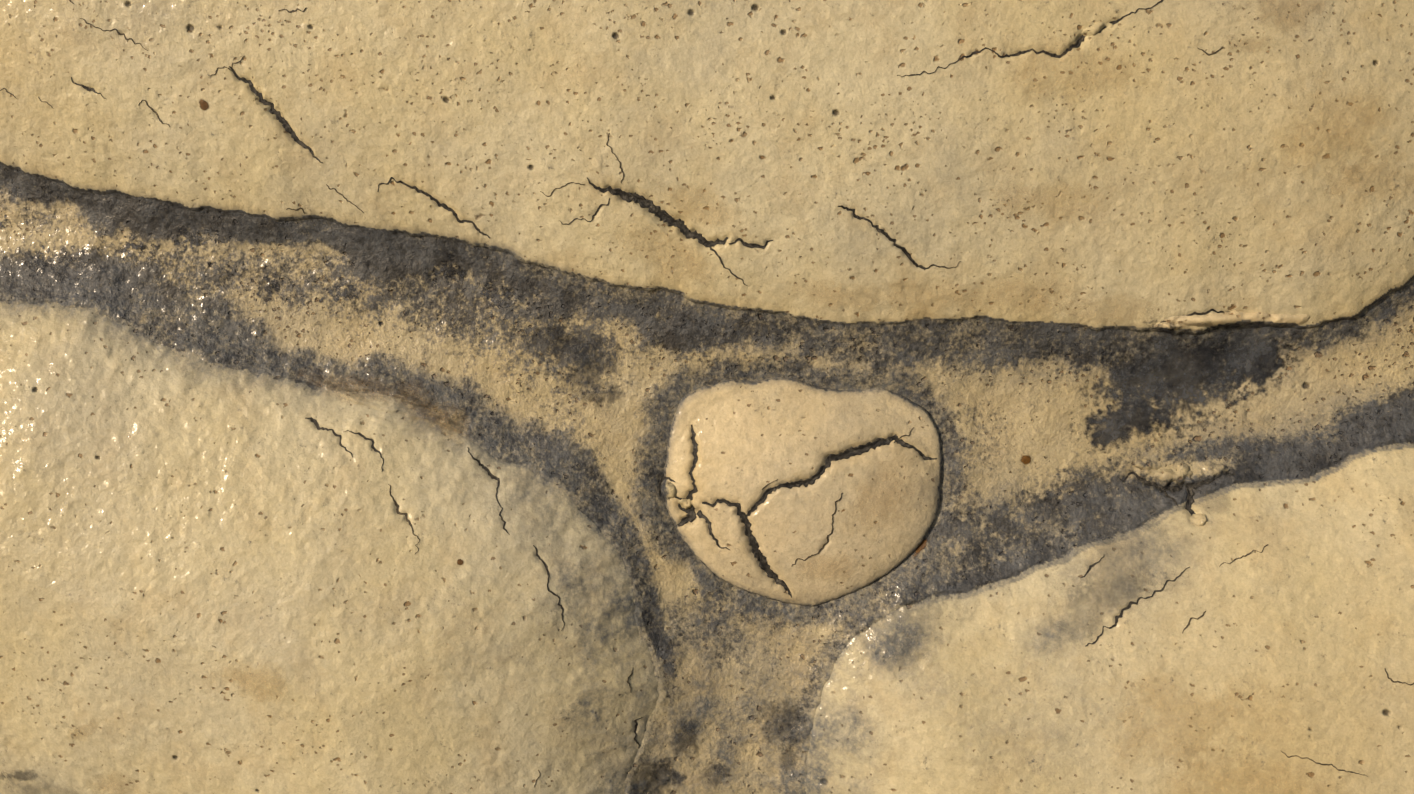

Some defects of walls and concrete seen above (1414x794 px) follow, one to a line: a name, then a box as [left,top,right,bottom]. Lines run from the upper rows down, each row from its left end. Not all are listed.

crack [897,0,1163,77]
crack [210,56,490,238]
leakage [26,226,206,284]
leakage [256,272,286,296]
leakage [319,283,359,314]
leakage [423,253,466,294]
leakage [480,283,527,318]
crack [540,133,773,286]
crack [838,205,961,270]
leakage [1072,322,1301,450]
crack [305,417,420,555]
crack [675,425,937,598]